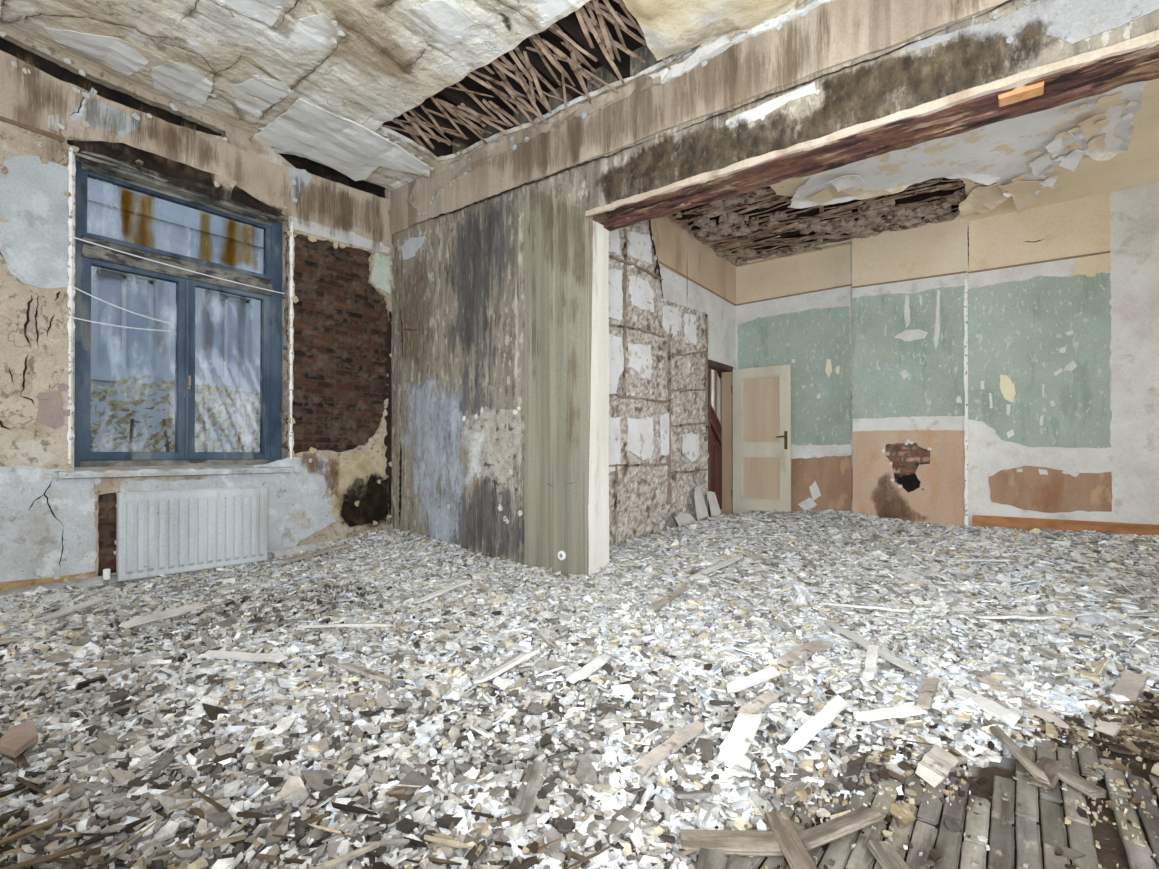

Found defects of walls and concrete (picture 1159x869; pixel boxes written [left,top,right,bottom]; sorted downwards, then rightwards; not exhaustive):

crack [0,0,430,124]
flaking render [407,0,833,216]
leakage [597,21,1053,202]
flaking render [585,0,1159,218]
rust [121,188,153,248]
rust [199,213,257,267]
flaking render [0,32,425,582]
leakage [404,195,524,559]
crack [28,478,66,568]
flaking render [462,406,523,525]
peeling [798,481,821,510]
flaking render [882,439,932,493]